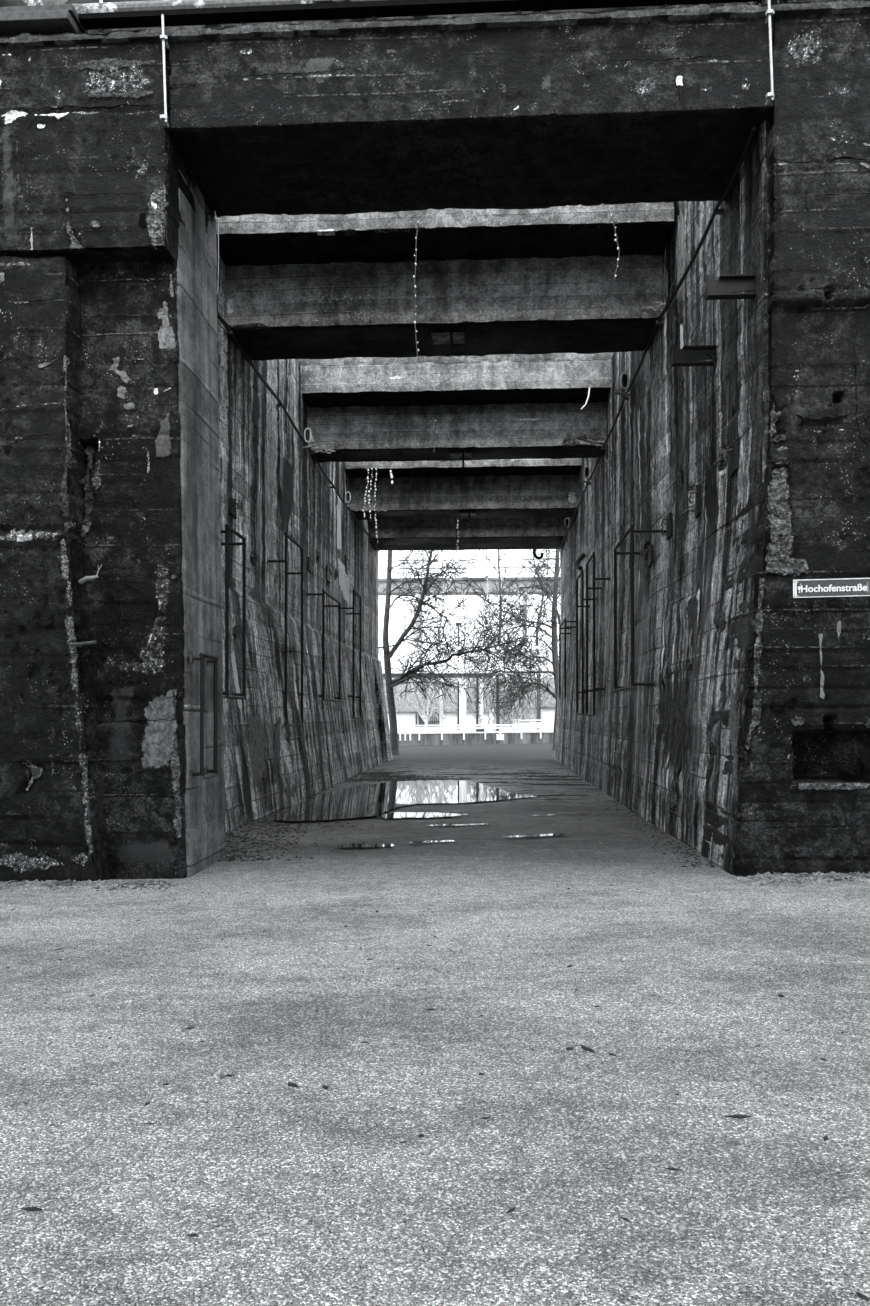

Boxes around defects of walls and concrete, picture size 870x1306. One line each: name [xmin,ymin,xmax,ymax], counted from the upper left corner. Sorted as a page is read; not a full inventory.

spalling [765,404,794,562]
spalling [745,578,765,749]
spalling [170,728,182,838]